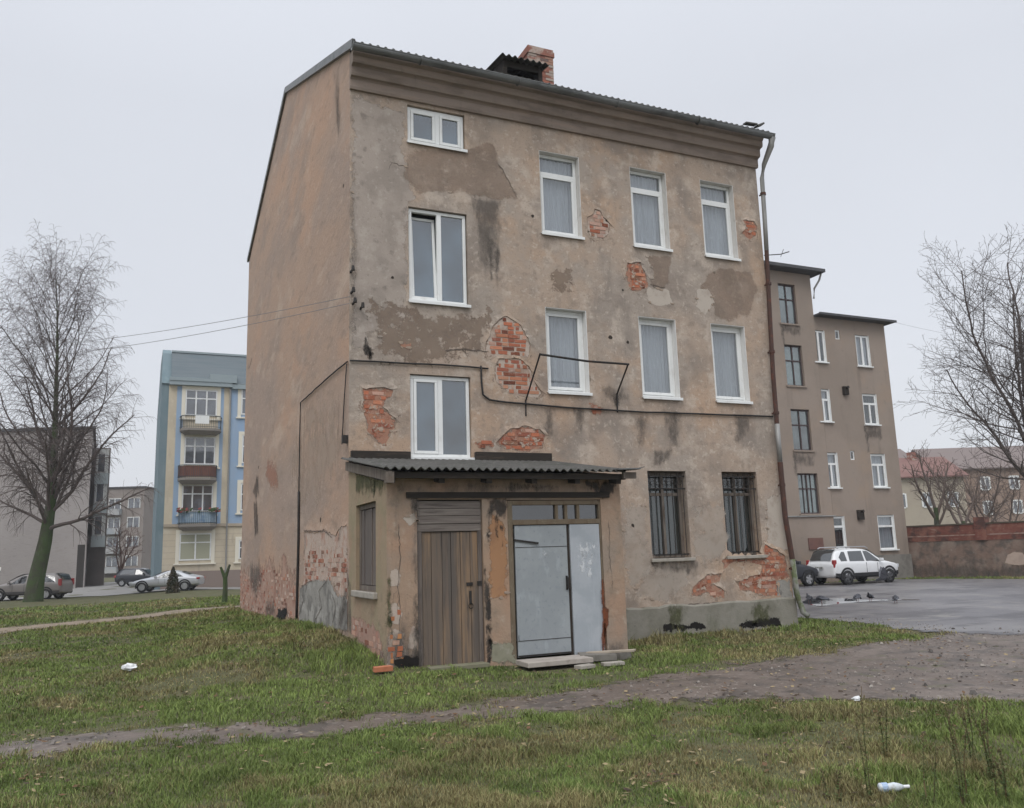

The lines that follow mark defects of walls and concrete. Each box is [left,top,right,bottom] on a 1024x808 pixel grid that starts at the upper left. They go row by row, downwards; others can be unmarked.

peeling [343,96,549,403]
leakage [476,200,498,267]
spalling [582,203,615,244]
spalling [621,255,663,304]
spalling [738,217,760,243]
spalling [356,380,401,449]
spalling [475,420,550,453]
spalling [240,517,350,620]
peeling [488,515,510,599]
spalling [688,509,792,603]
peeling [351,603,420,668]